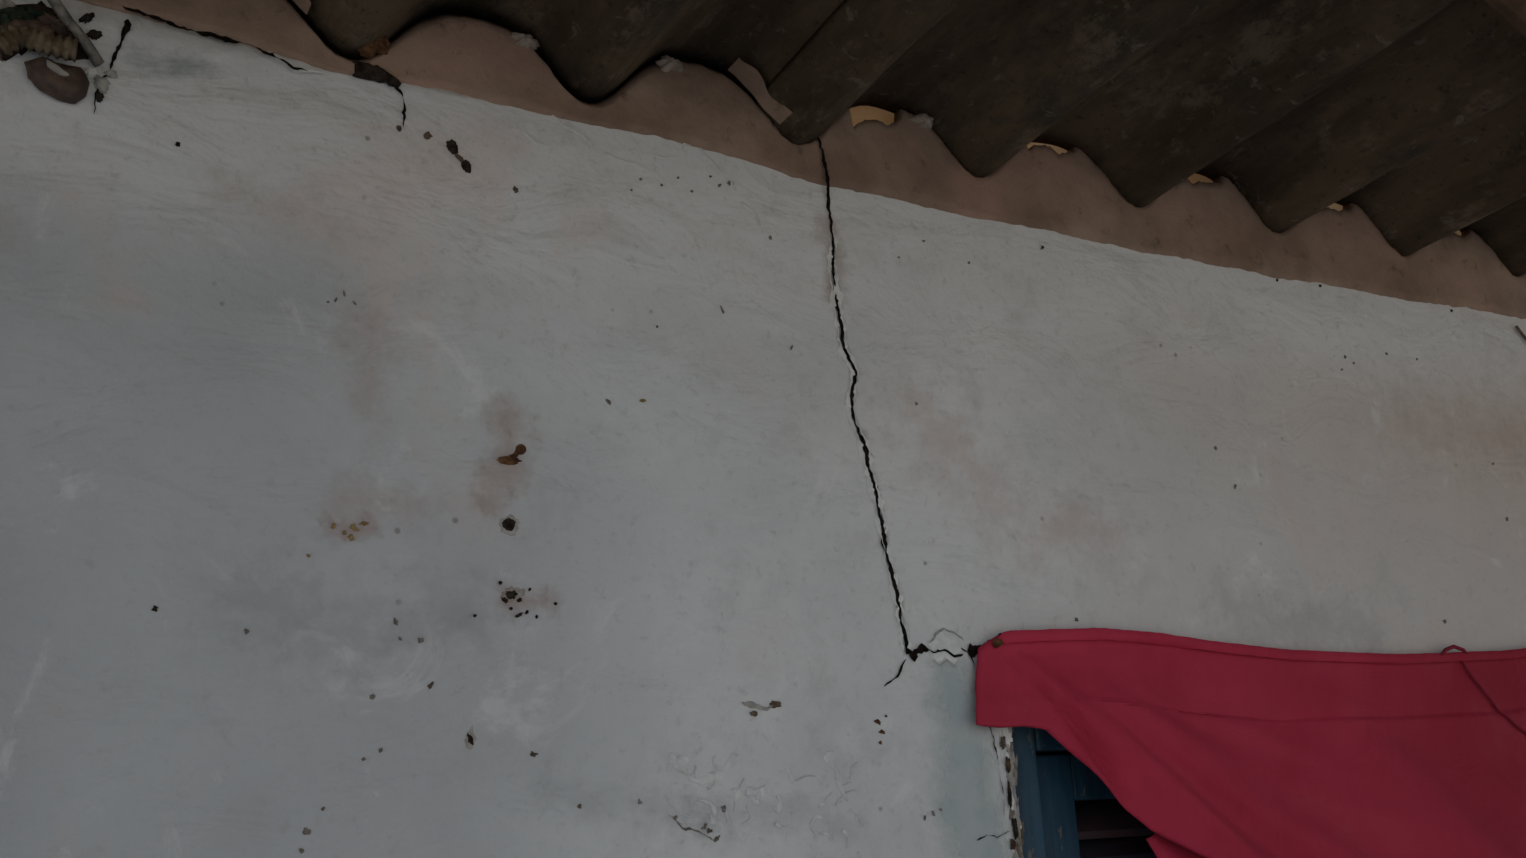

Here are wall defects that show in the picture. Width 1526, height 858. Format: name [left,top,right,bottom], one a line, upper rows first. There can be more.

spalling [0,0,117,103]
rust [497,456,522,465]
crack [817,137,1002,687]
spalling [977,727,1025,858]